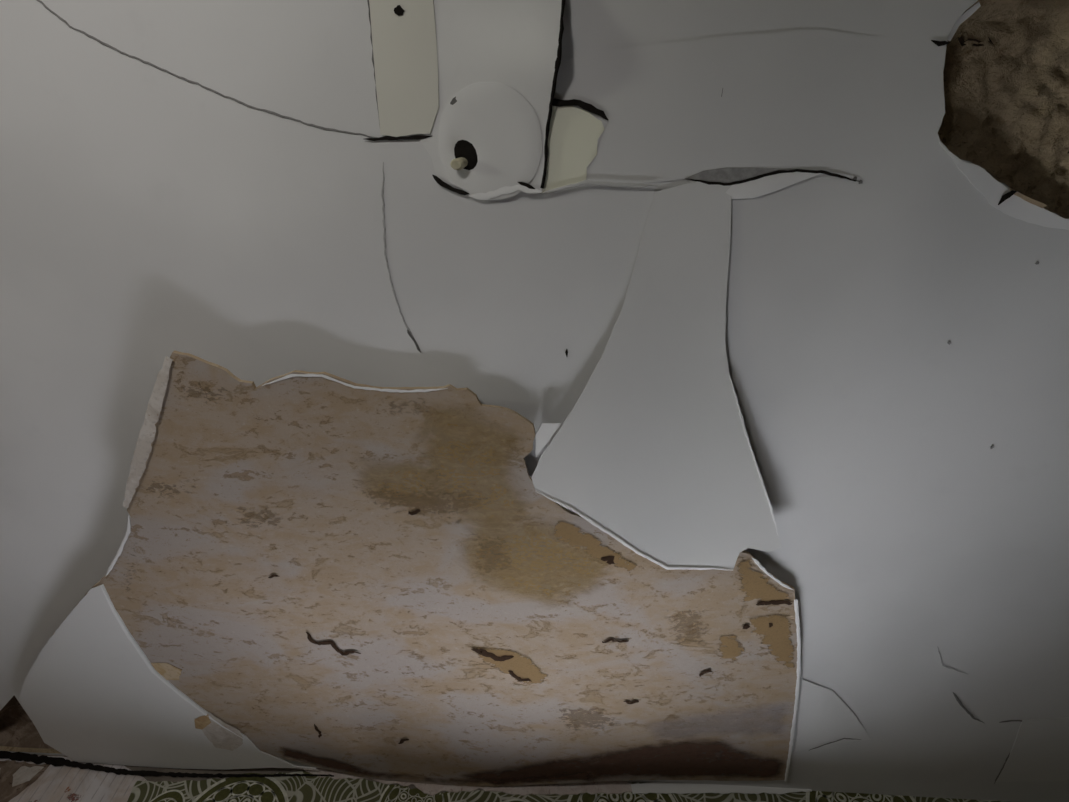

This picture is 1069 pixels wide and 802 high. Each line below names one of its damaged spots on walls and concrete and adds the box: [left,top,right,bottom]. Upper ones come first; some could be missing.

crack [37,0,403,141]
spalling [938,0,1069,230]
crack [432,174,469,195]
crack [518,181,535,189]
crack [688,169,860,186]
crack [407,330,421,353]
peeling [535,423,561,457]
water stain [366,413,599,600]
peeling [554,521,636,571]
peeling [749,615,795,668]
peeling [477,648,547,684]
peeling [0,760,49,802]